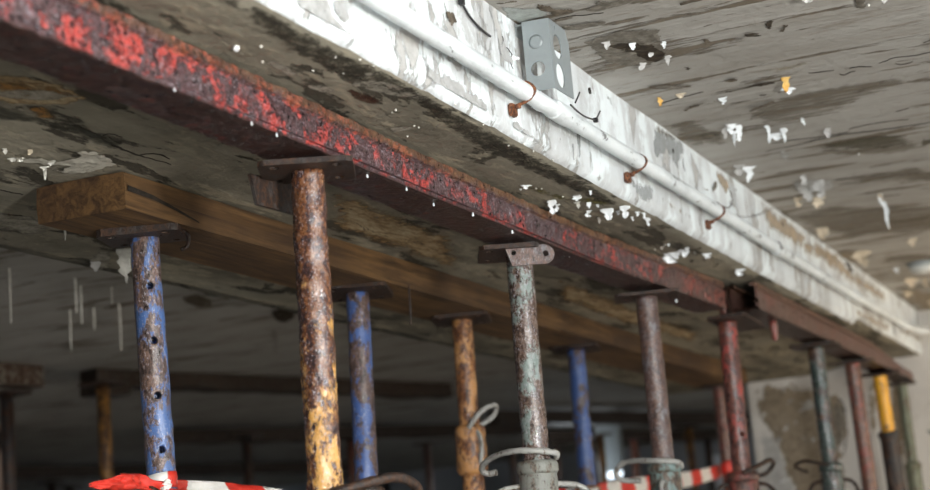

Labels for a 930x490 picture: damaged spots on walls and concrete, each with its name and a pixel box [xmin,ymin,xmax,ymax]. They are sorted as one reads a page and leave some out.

spalling [537,0,672,71]
spalling [249,6,445,111]
corrosion [348,89,379,104]
peeling [722,123,743,147]
peeling [764,125,788,144]
peeling [2,148,116,174]
peeling [732,164,757,183]
peeling [519,185,651,226]
peeling [792,175,834,209]
peeling [876,194,890,229]
peeling [654,243,712,264]
spalling [756,383,822,490]